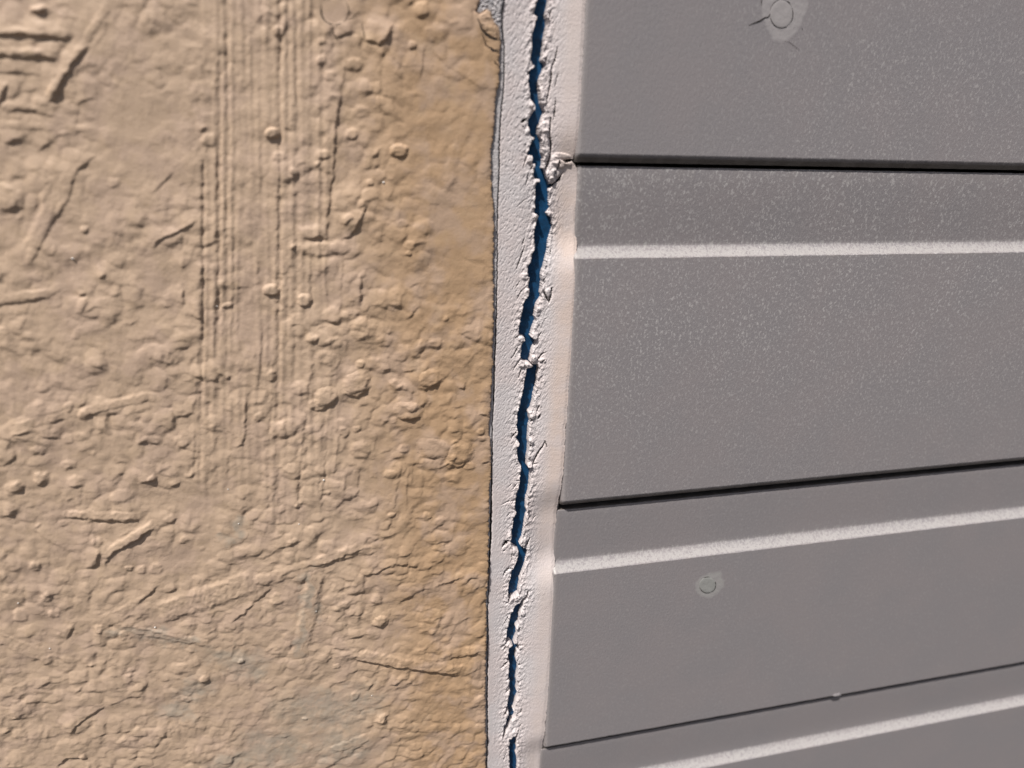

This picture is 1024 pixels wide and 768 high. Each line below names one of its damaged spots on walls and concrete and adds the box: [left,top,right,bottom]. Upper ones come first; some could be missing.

crack [486,0,579,768]